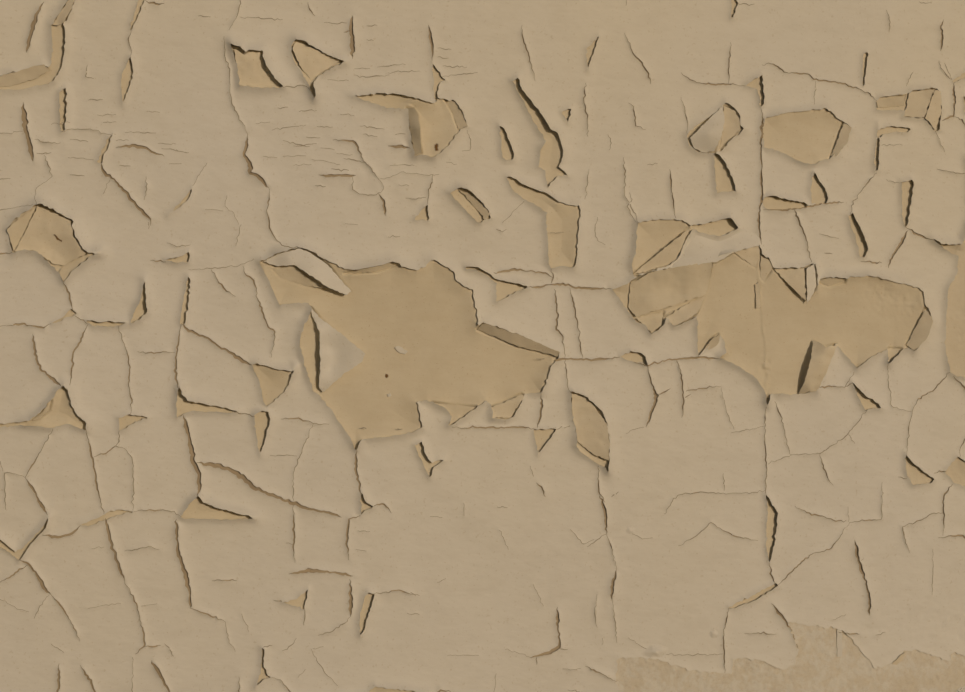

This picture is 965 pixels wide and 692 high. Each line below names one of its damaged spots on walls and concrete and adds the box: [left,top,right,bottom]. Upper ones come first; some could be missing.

peeling [7,204,95,281]
crack [1,67,207,226]
crack [118,198,275,411]
peeling [231,44,283,88]
crack [224,0,478,248]
peeling [260,247,560,452]
peeling [355,65,467,157]
peeling [507,78,580,268]
crack [495,268,867,513]
peeling [612,213,933,405]
crack [0,415,391,692]
crack [573,469,965,669]